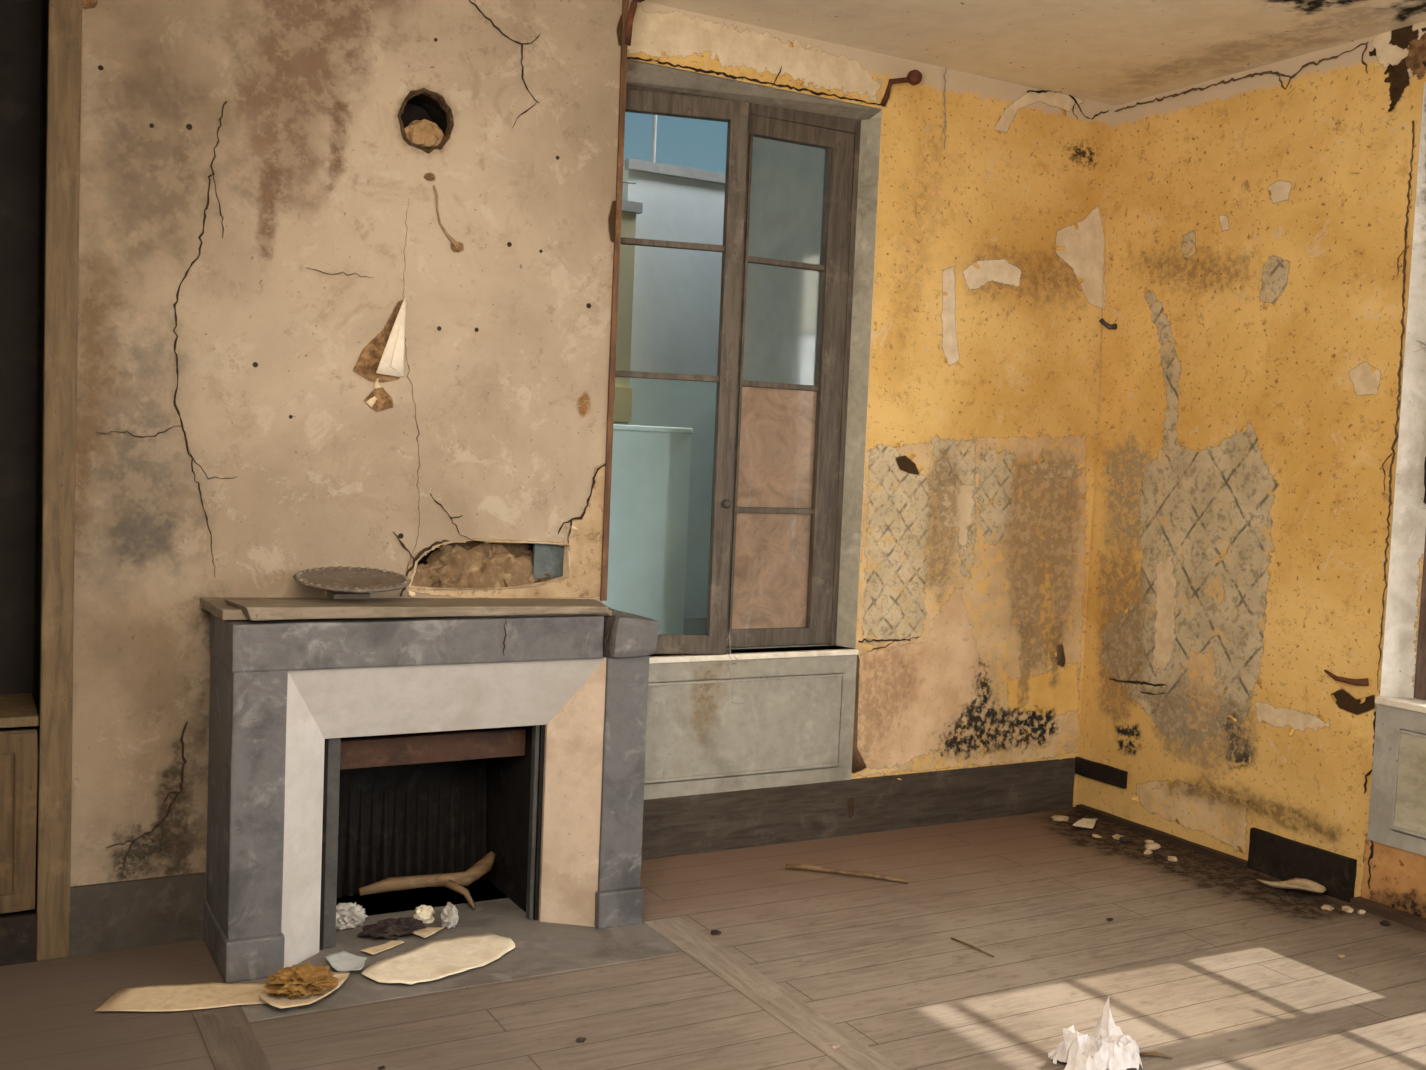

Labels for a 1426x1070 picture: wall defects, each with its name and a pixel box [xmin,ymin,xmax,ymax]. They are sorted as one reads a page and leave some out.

damp [245,0,382,256]
crack [469,0,540,128]
damp [1269,0,1361,14]
flaking render [1369,21,1426,113]
damp [1392,0,1426,21]
crack [96,101,235,575]
flaking render [353,296,406,412]
spalling [406,463,605,598]
crack [558,463,606,544]
peeling [1100,287,1330,748]
peeling [851,434,1090,780]
damp [939,457,1077,758]